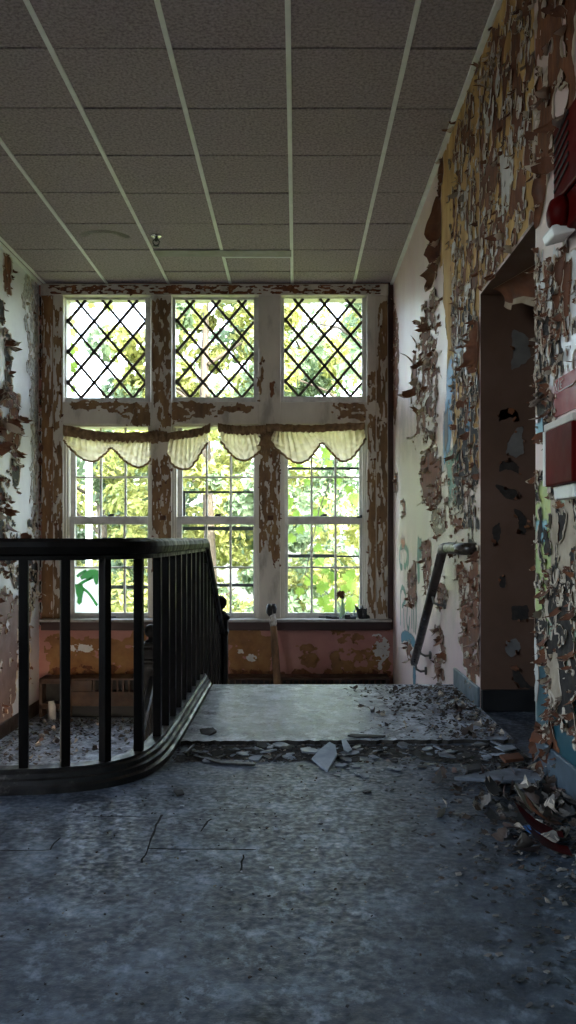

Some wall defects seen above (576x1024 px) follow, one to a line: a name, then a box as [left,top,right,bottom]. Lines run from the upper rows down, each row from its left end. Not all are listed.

peeling [0,0,576,773]
crack [92,815,256,871]